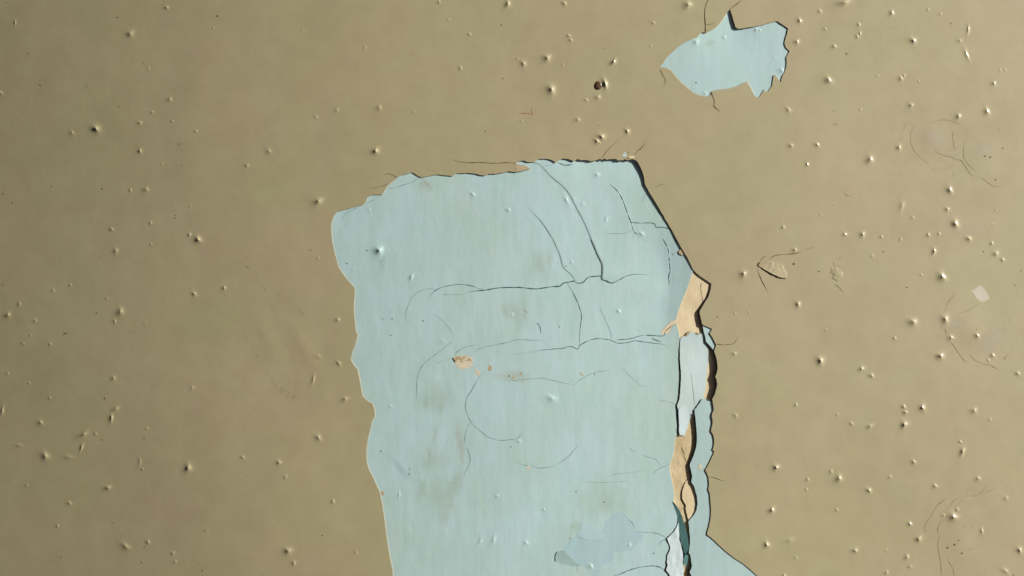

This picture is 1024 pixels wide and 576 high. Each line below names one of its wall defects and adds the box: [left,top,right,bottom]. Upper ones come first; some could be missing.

peeling [660,10,789,98]
crack [381,160,671,474]
peeling [331,152,757,576]
crack [615,514,675,576]